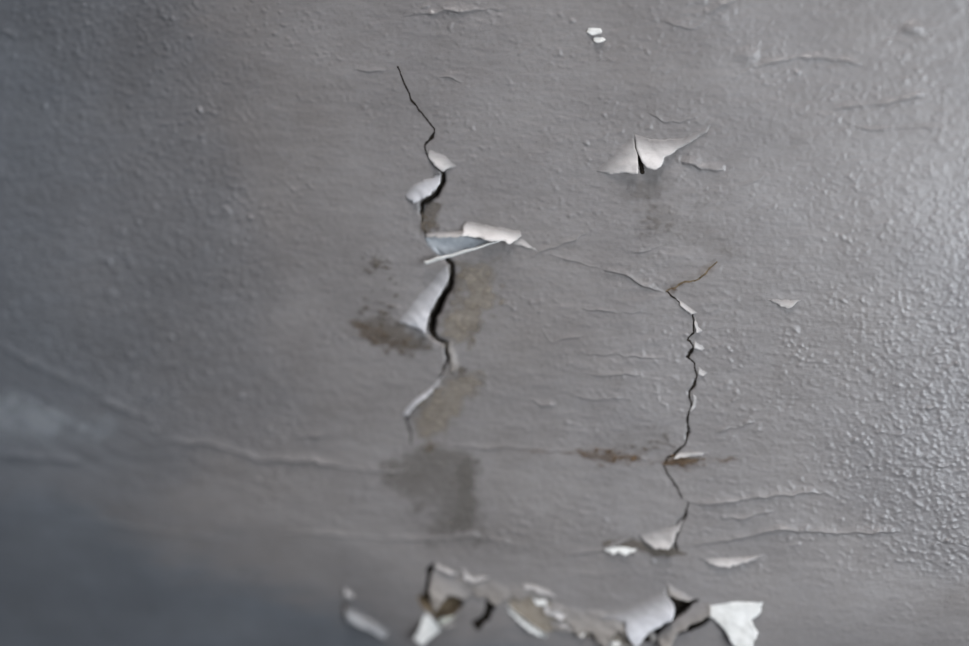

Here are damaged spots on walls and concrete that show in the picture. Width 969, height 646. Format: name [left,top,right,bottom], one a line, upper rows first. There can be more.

peeling [597,125,711,174]
crack [397,66,537,452]
crack [601,261,718,551]
peeling [562,517,686,557]
peeling [702,554,764,568]
peeling [343,587,388,639]
peeling [413,563,763,646]